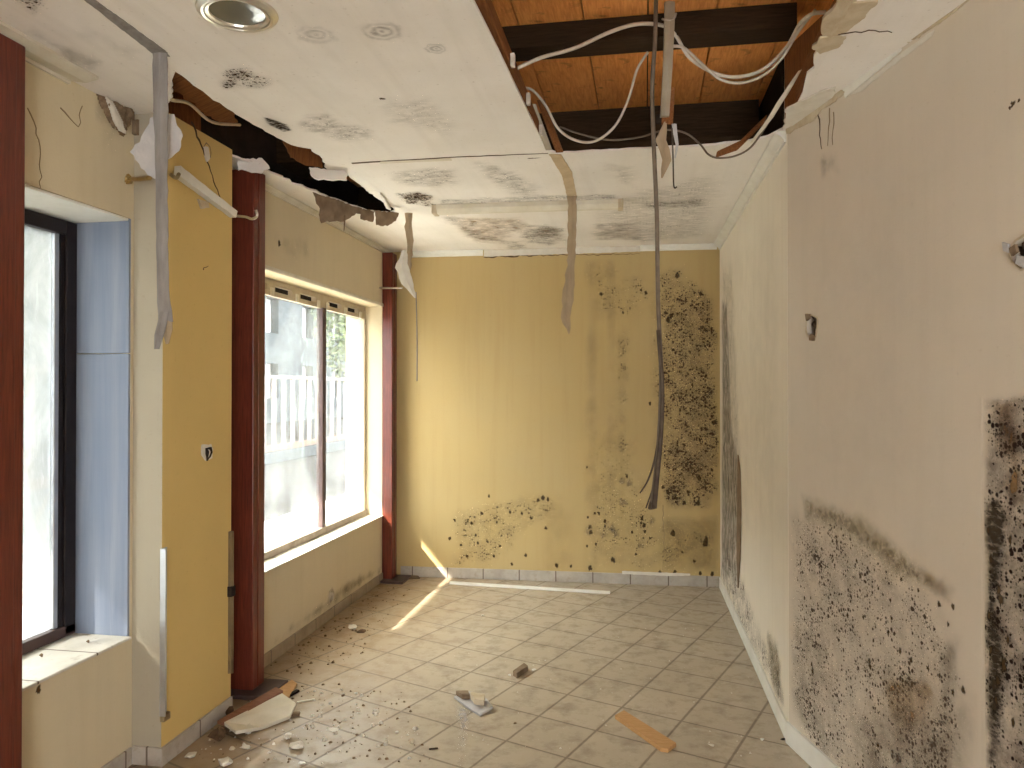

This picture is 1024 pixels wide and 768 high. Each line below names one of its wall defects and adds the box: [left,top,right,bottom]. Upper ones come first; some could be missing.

crack [27,108,42,188]
spalling [96,94,139,137]
crack [191,121,221,198]
water stain [222,68,268,88]
water stain [398,170,472,206]
crack [818,108,834,149]
flaking render [783,0,969,134]
water stain [586,269,780,695]
water stain [448,494,552,565]
water stain [984,399,1024,768]
water stain [793,506,965,768]